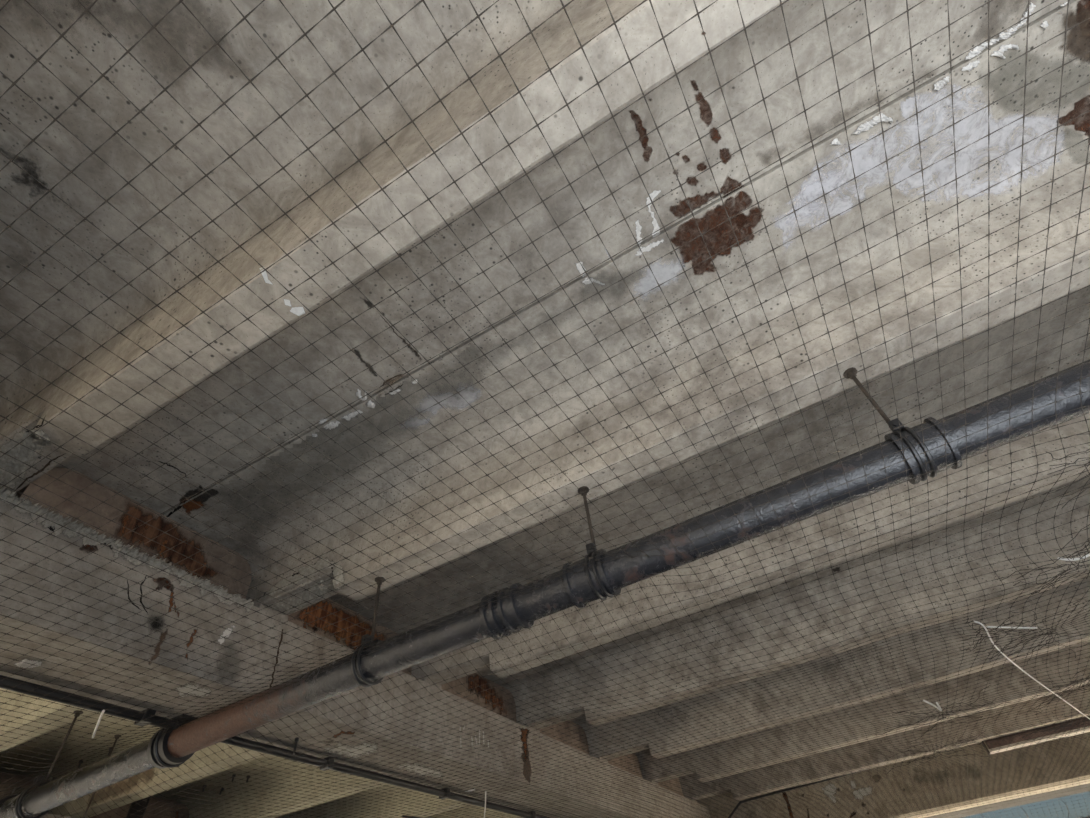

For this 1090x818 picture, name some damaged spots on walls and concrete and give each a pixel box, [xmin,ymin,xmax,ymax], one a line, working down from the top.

water stain [961,2,1049,72]
rust [1061,0,1090,61]
water stain [15,156,45,196]
rust [629,110,653,162]
rust [691,80,731,164]
water stain [777,74,1090,246]
rust [670,153,763,275]
water stain [640,264,680,294]
spalling [0,486,254,617]
rust [520,728,532,783]